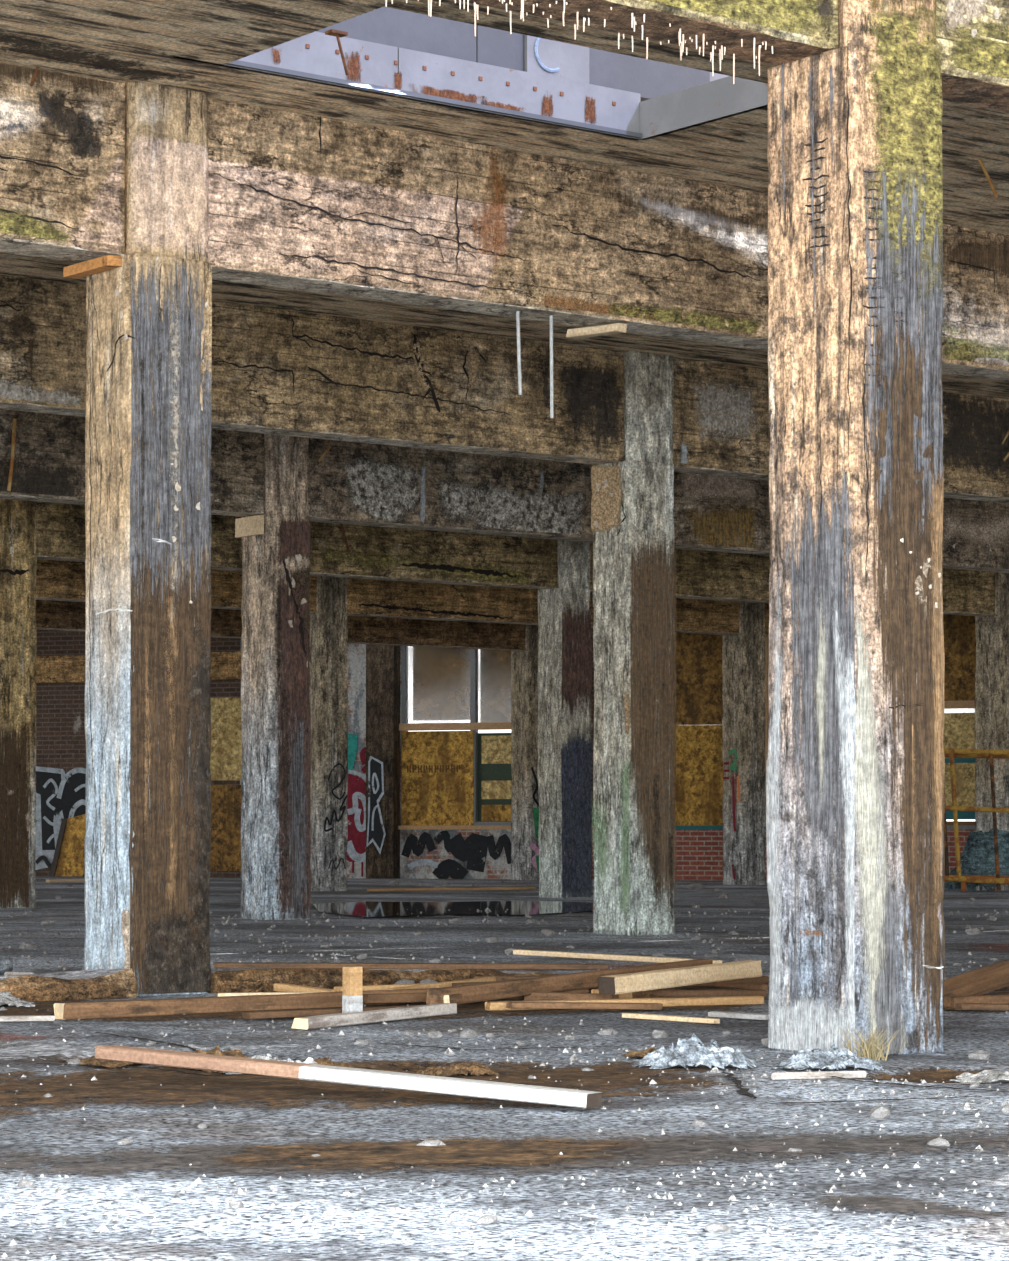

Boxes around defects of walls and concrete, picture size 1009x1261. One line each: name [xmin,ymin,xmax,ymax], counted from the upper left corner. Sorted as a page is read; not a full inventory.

rust [345,51,361,82]
rust [394,72,523,111]
rust [542,95,553,117]
crack [212,173,529,292]
crack [89,264,517,728]
crack [722,1066,1009,1104]